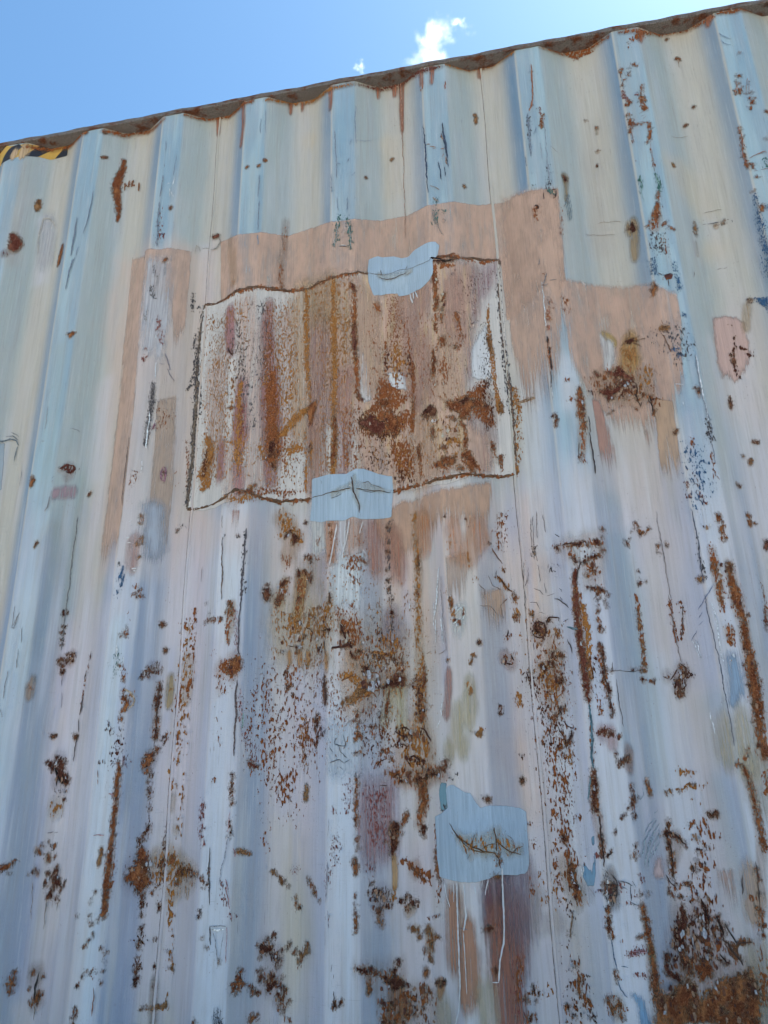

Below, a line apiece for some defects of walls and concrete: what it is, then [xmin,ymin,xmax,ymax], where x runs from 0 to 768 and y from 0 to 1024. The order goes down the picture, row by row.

rust [542,8,752,61]
rust [102,117,165,137]
rust [184,51,514,147]
rust [625,84,656,171]
rust [738,127,768,178]
rust [112,159,140,222]
rust [0,233,25,257]
rust [75,255,693,1024]
rust [637,418,768,1024]